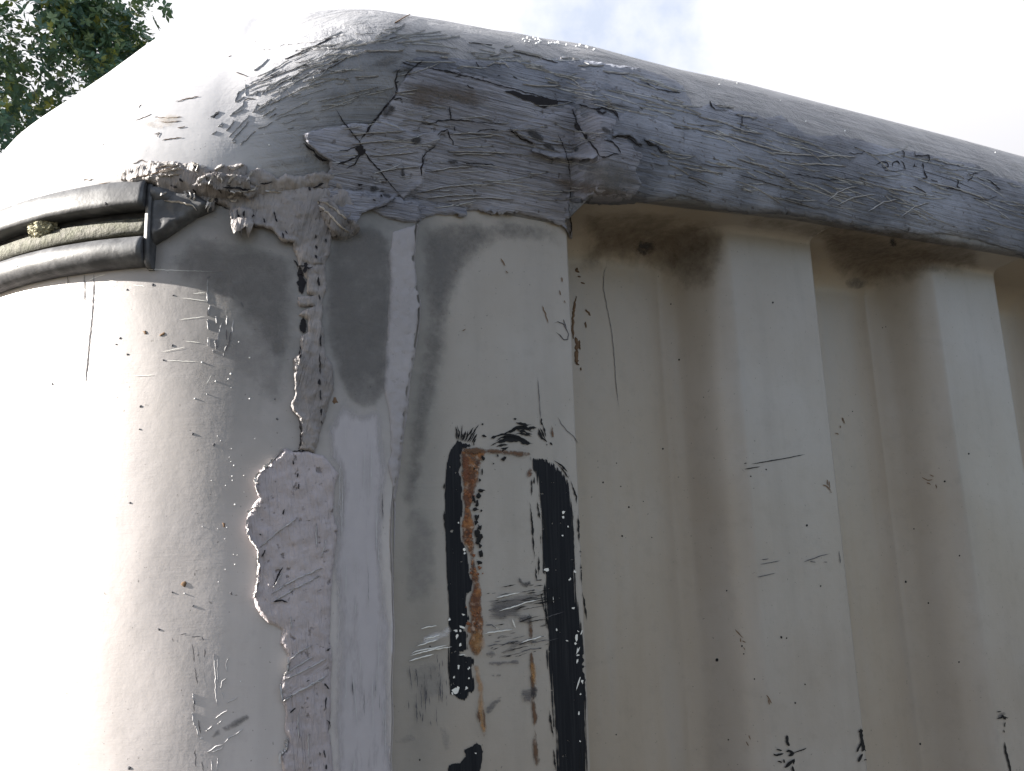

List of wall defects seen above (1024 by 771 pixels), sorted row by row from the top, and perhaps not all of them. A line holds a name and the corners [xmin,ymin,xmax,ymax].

crack [303,60,668,236]
peeling [512,108,598,160]
peeling [611,110,684,157]
crack [215,182,271,210]
corrosion [462,447,530,654]